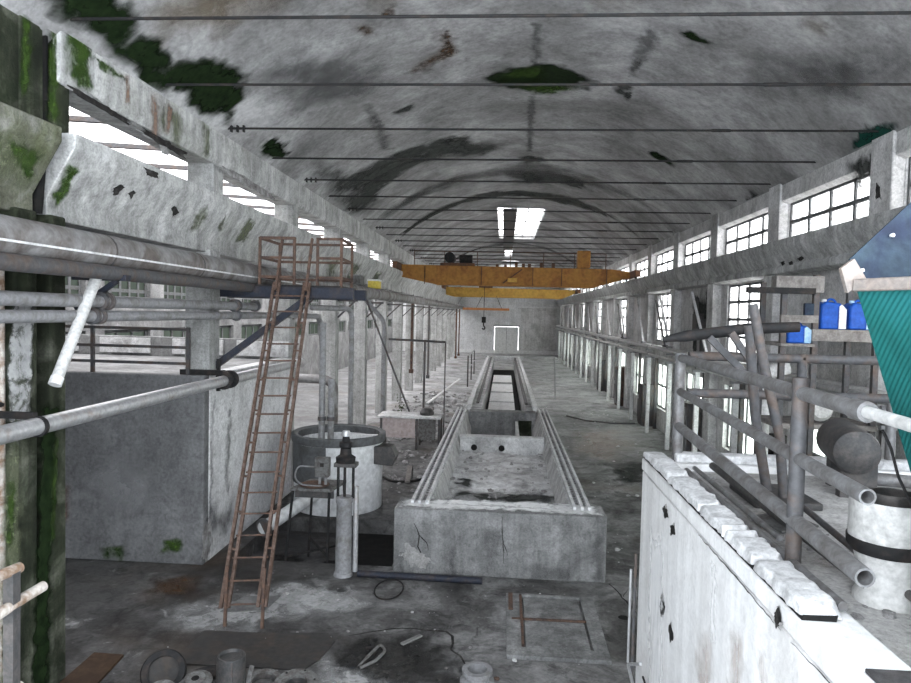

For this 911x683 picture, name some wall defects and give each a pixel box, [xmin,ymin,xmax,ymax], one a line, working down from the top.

water stain [316,117,496,213]
water stain [398,101,631,236]